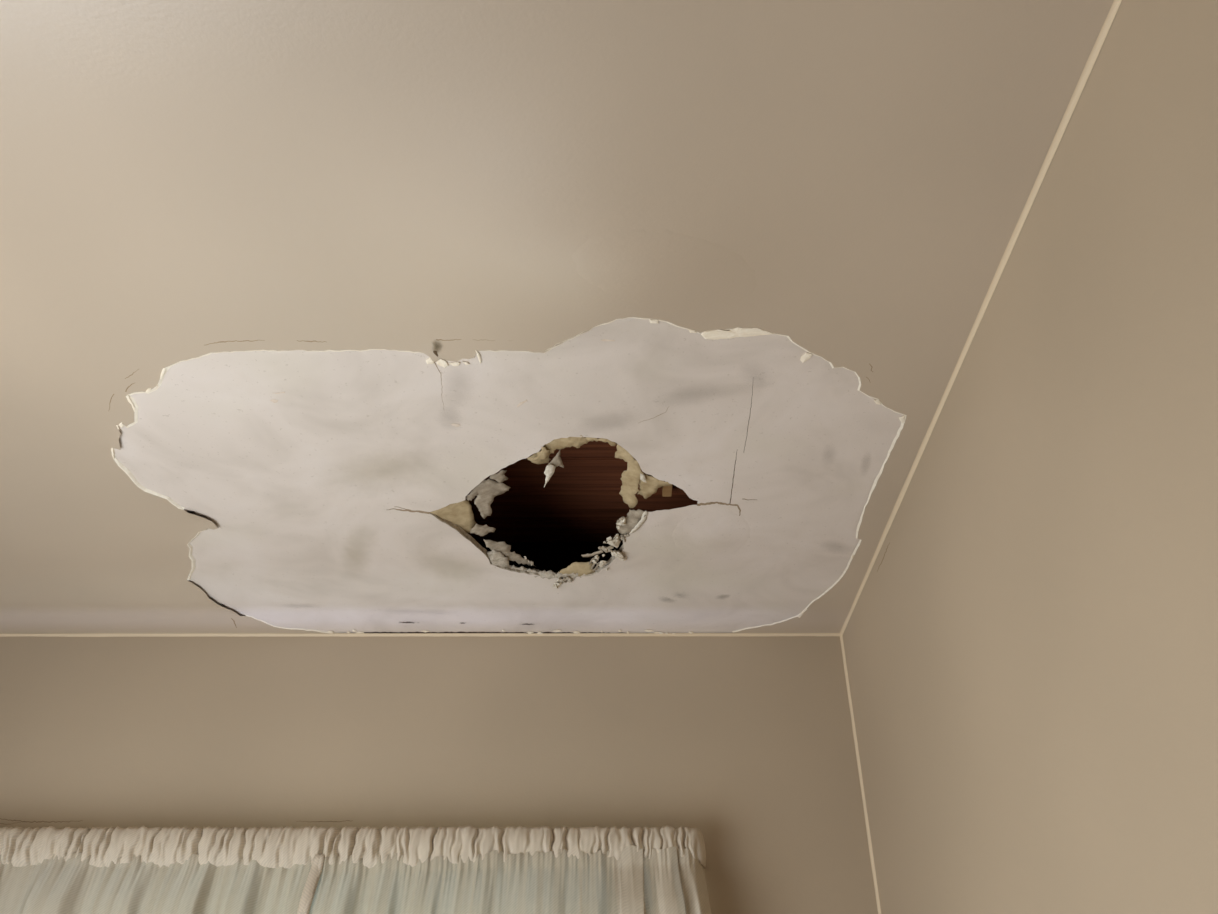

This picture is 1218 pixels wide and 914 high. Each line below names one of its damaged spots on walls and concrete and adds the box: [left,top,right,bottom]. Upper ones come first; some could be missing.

peeling [111,317,907,634]
crack [697,386,756,516]